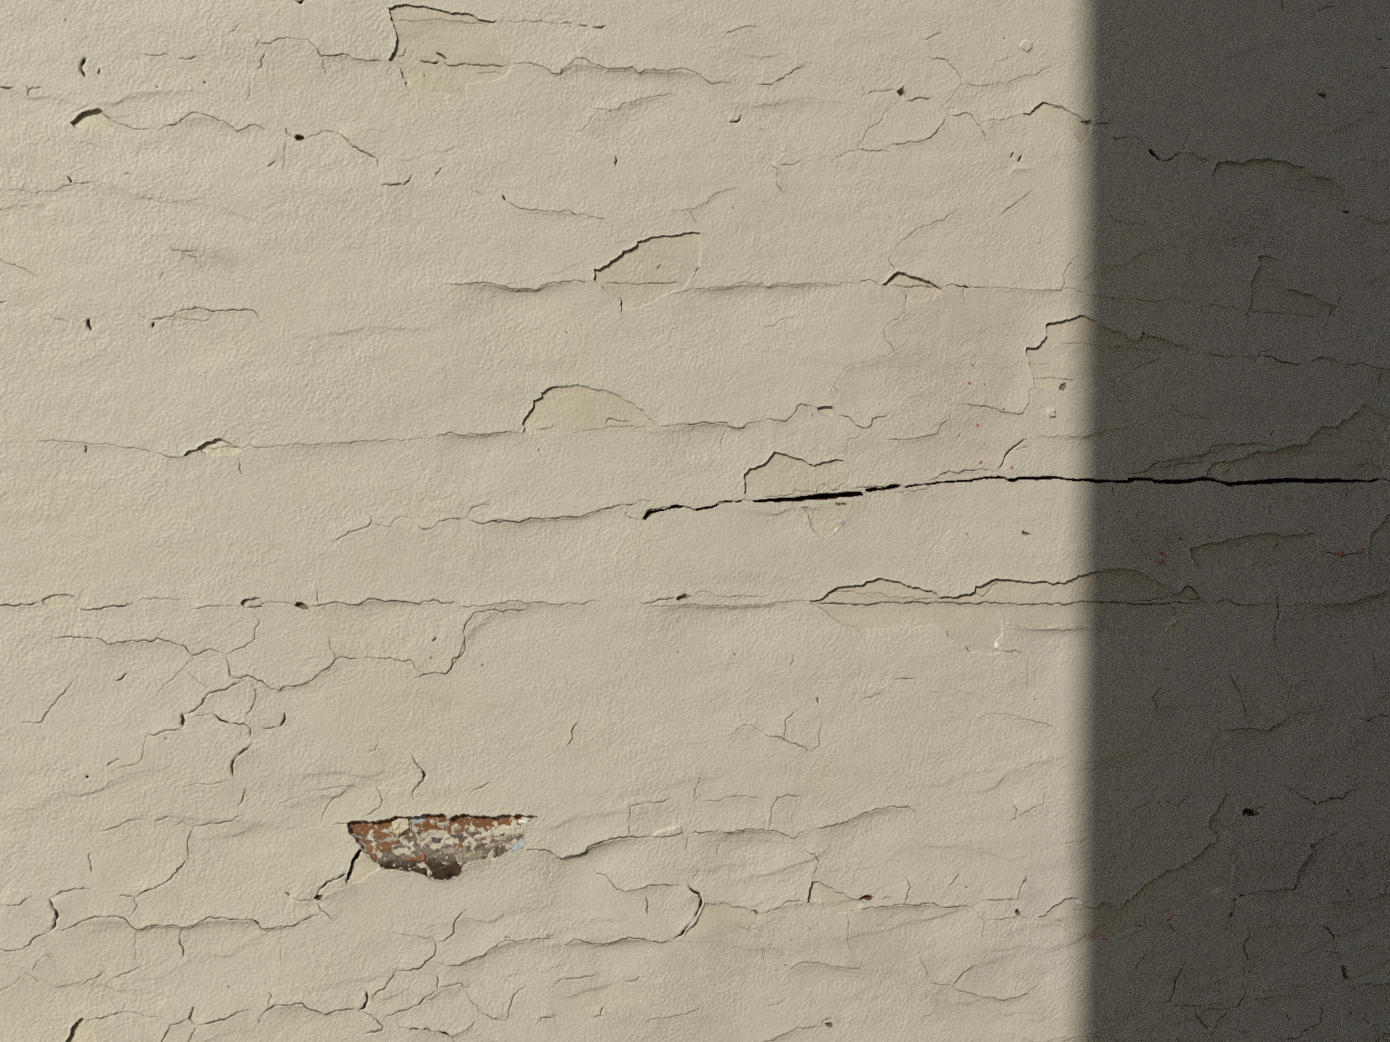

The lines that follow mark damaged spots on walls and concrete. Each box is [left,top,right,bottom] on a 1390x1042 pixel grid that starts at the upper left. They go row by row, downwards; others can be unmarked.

peeling [591,229,702,314]
peeling [1023,312,1196,391]
peeling [1205,402,1390,479]
crack [340,476,1389,538]
peeling [807,565,1209,655]
spalling [345,813,539,886]
crack [2,594,915,1042]
crack [763,876,1037,1042]